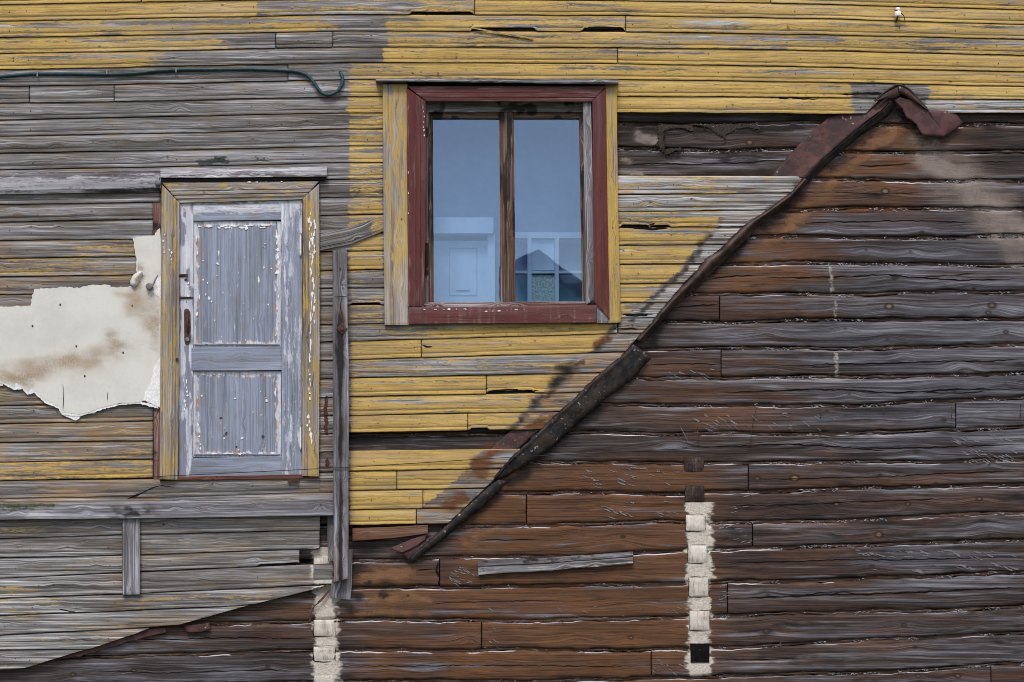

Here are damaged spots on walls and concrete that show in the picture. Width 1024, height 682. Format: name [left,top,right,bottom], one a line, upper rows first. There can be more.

crack [586,23,623,31]
peeling [187,224,280,336]
peeling [307,213,316,400]
corrosion [471,444,501,478]